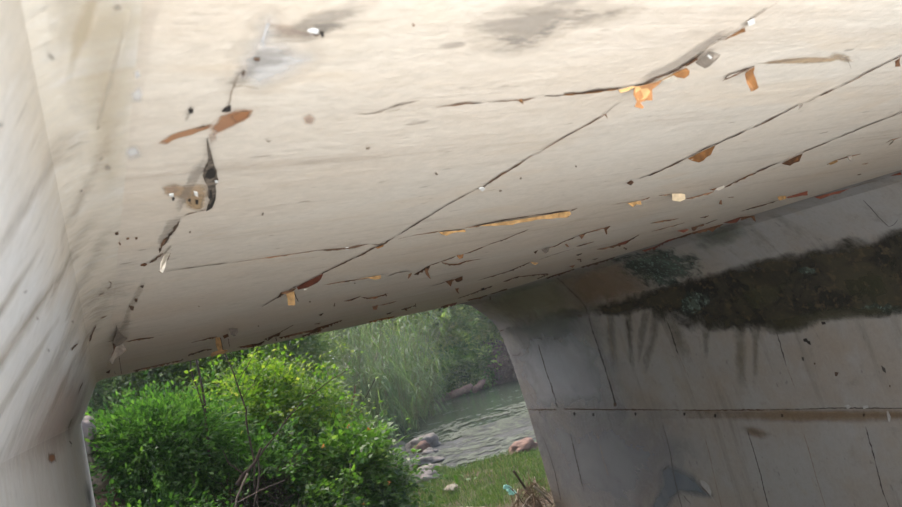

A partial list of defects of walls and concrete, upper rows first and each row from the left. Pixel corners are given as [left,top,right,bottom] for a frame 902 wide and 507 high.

crack [744,1,779,26]
crack [222,73,259,112]
peeling [618,51,720,109]
crack [645,40,720,84]
peeling [723,65,759,91]
crack [714,56,901,146]
crack [803,112,902,153]
peeling [165,139,218,211]
crack [140,88,620,285]
peeling [476,208,577,226]
crack [460,159,902,507]
leakage [548,422,665,507]